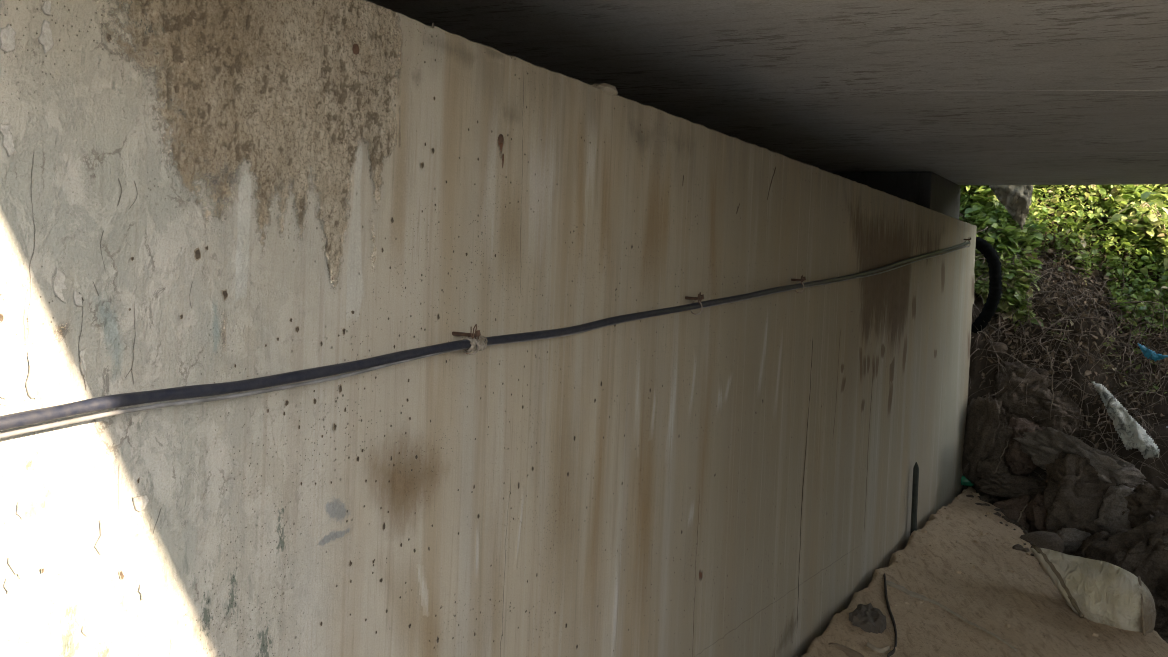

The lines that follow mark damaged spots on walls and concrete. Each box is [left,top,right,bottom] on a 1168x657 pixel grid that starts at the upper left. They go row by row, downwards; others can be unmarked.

damp [231,168,254,307]
damp [840,292,916,424]
damp [347,404,459,657]